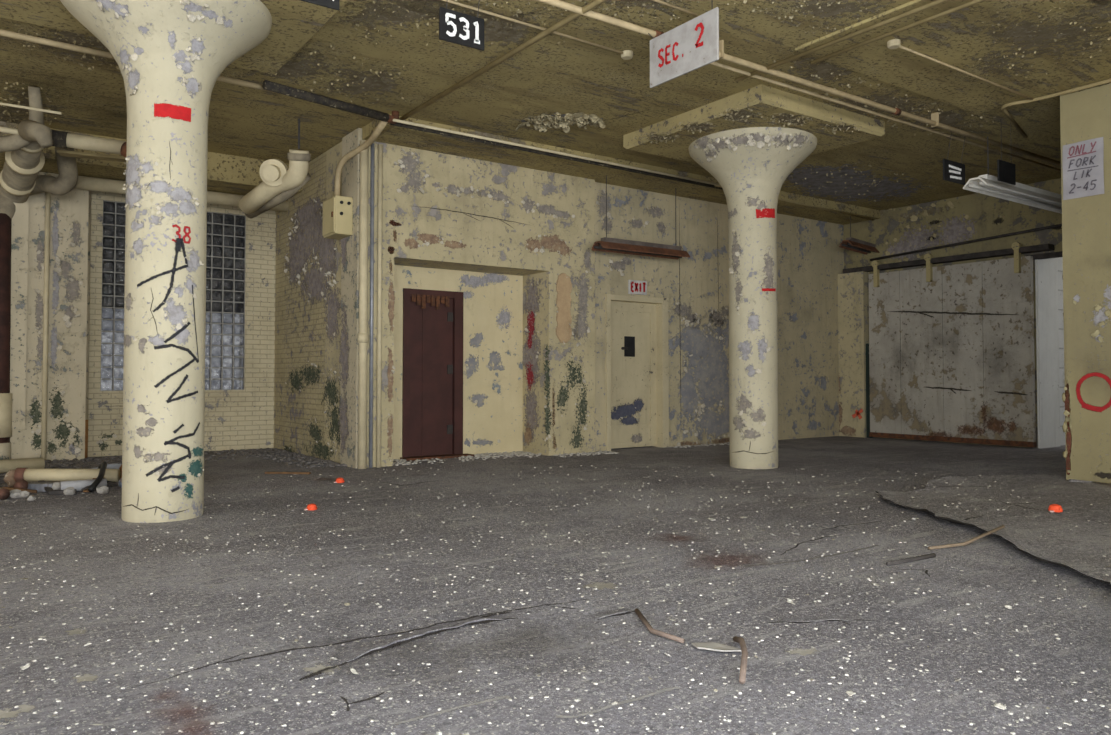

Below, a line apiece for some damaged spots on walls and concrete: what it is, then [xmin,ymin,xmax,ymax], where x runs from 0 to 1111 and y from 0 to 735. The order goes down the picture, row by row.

peeling [16,24,144,96]
peeling [634,57,996,162]
peeling [404,233,467,250]
peeling [394,148,575,220]
peeling [782,162,979,263]
peeling [123,246,204,353]
peeling [283,194,350,460]
peeling [464,332,507,380]
flaking render [496,234,592,453]
peeling [668,197,772,447]
crack [120,597,635,692]
crack [340,692,384,711]